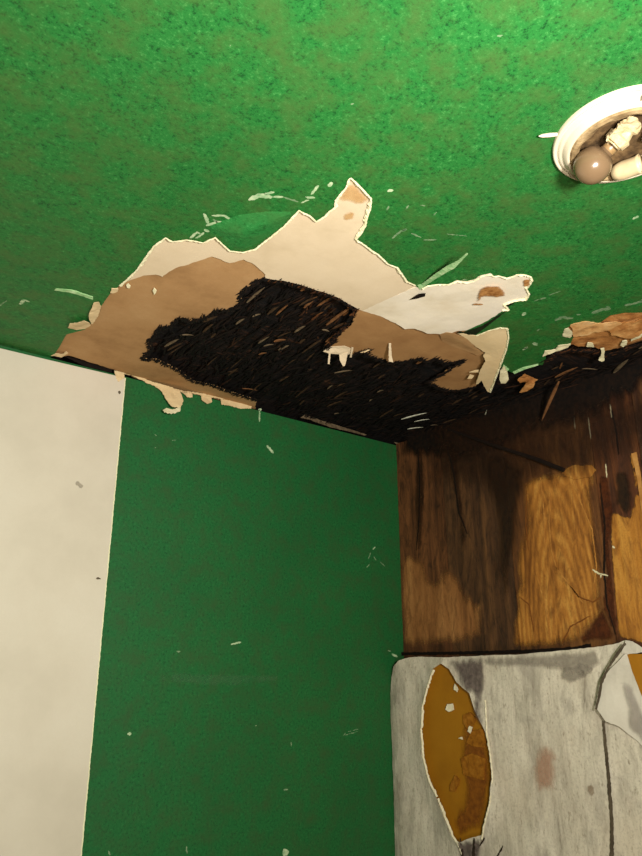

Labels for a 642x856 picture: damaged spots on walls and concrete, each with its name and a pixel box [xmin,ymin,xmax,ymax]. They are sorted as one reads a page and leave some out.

peeling [55,288,101,330]
peeling [110,178,560,335]
peeling [114,370,262,422]
peeling [301,416,367,436]
leakage [404,358,642,582]
leakage [582,473,630,641]
peeling [388,452,642,856]
leakage [456,653,597,717]
crack [595,484,626,856]
crack [460,838,503,856]